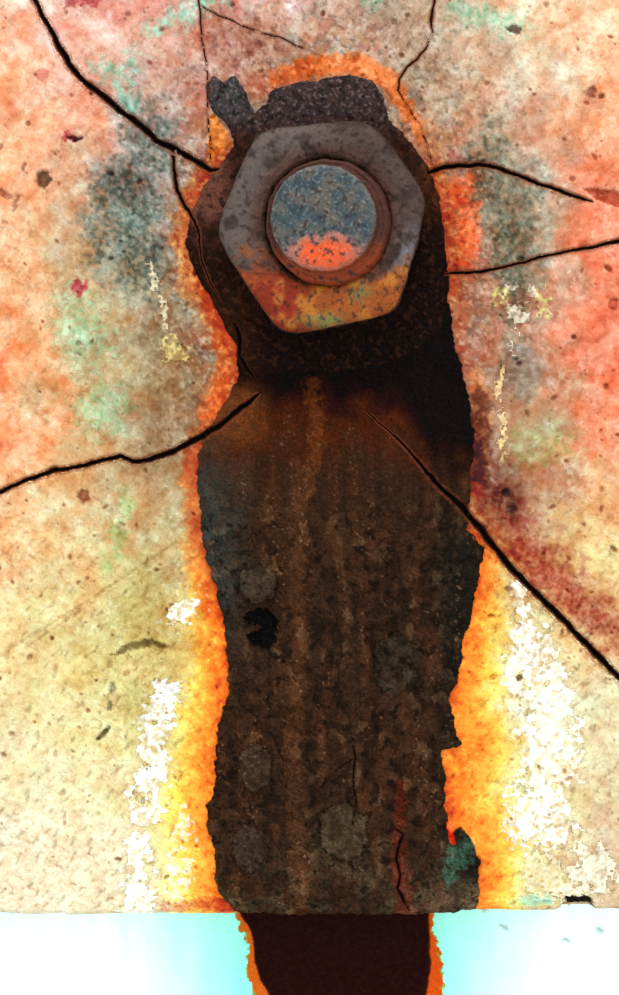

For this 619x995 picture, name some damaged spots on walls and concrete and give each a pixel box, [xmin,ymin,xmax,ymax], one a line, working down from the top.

leakage [35,66,50,82]
crack [0,0,322,497]
crack [395,0,593,204]
crack [444,237,619,277]
leakage [38,0,303,995]
corrosion [146,49,619,995]
crack [355,398,619,684]
leakage [432,580,619,995]